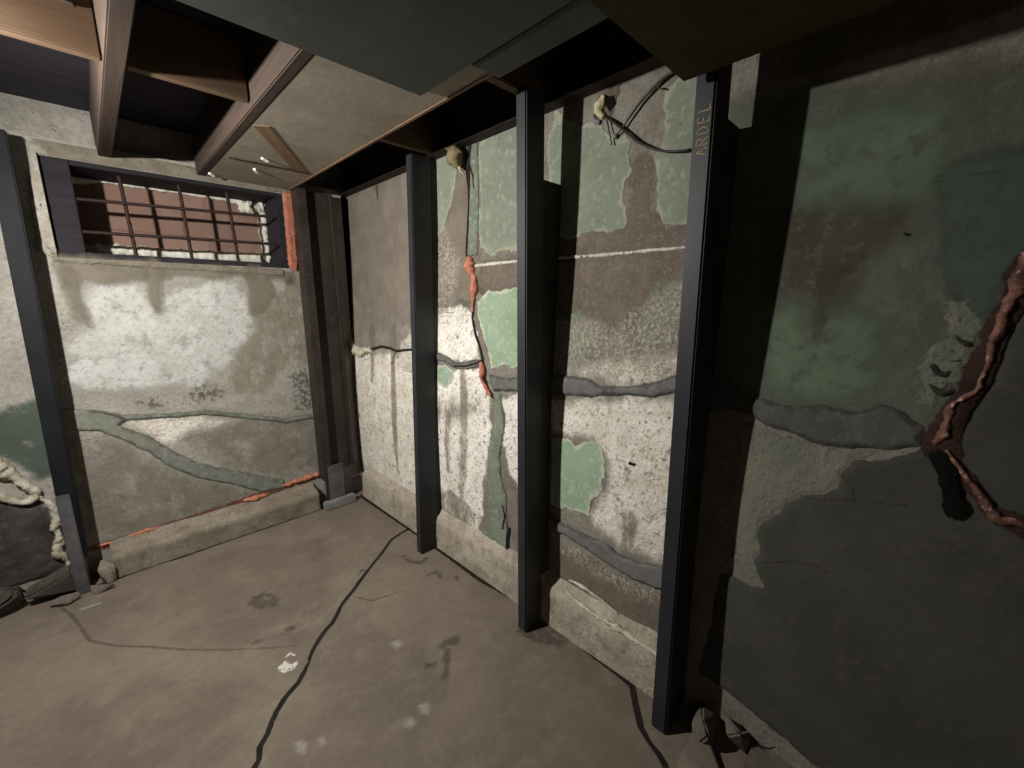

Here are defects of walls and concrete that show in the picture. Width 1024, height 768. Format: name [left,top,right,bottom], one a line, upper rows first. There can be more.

peeling [478,127,517,257]
peeling [547,83,632,241]
peeling [653,77,697,226]
leakage [57,256,317,471]
crack [453,311,494,399]
peeling [477,287,517,369]
crack [919,248,1024,539]
leakage [75,441,247,533]
corrosion [128,472,319,537]
peeling [550,437,605,516]
crack [251,495,515,768]
crack [583,649,669,768]